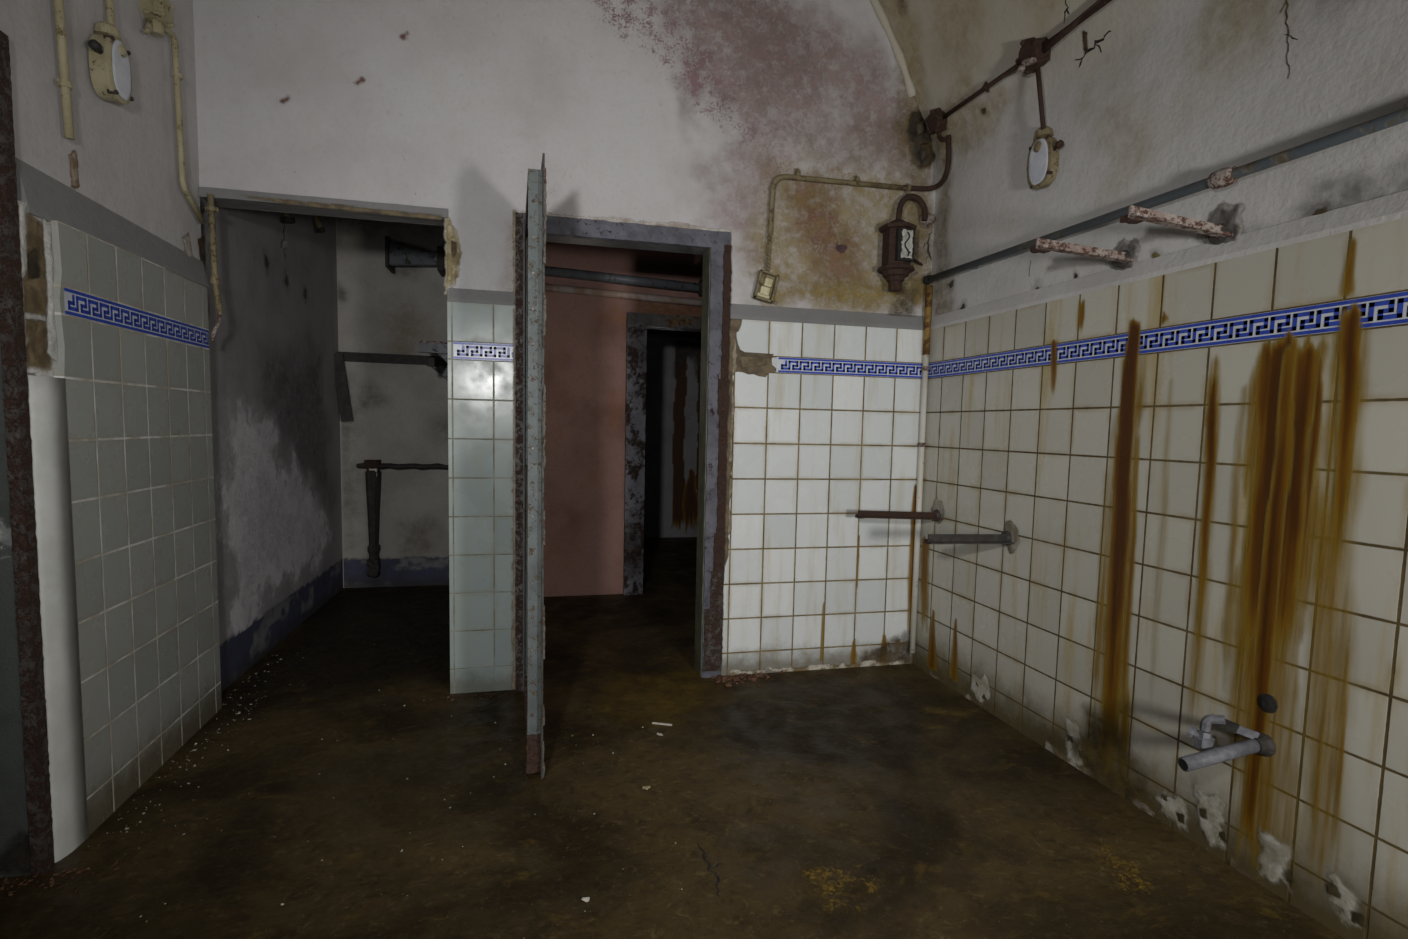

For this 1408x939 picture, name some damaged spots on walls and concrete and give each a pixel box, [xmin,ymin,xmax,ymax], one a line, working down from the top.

crack [1064,0,1112,67]
crack [1280,0,1298,78]
spalling [250,197,462,294]
water stain [595,0,948,315]
rust [672,343,701,532]
spalling [724,319,776,566]
rust [908,484,958,681]
rust [1095,319,1143,774]
rust [1193,358,1219,703]
rust [1227,238,1365,869]
peeling [1162,795,1207,824]
peeling [1327,884,1340,898]